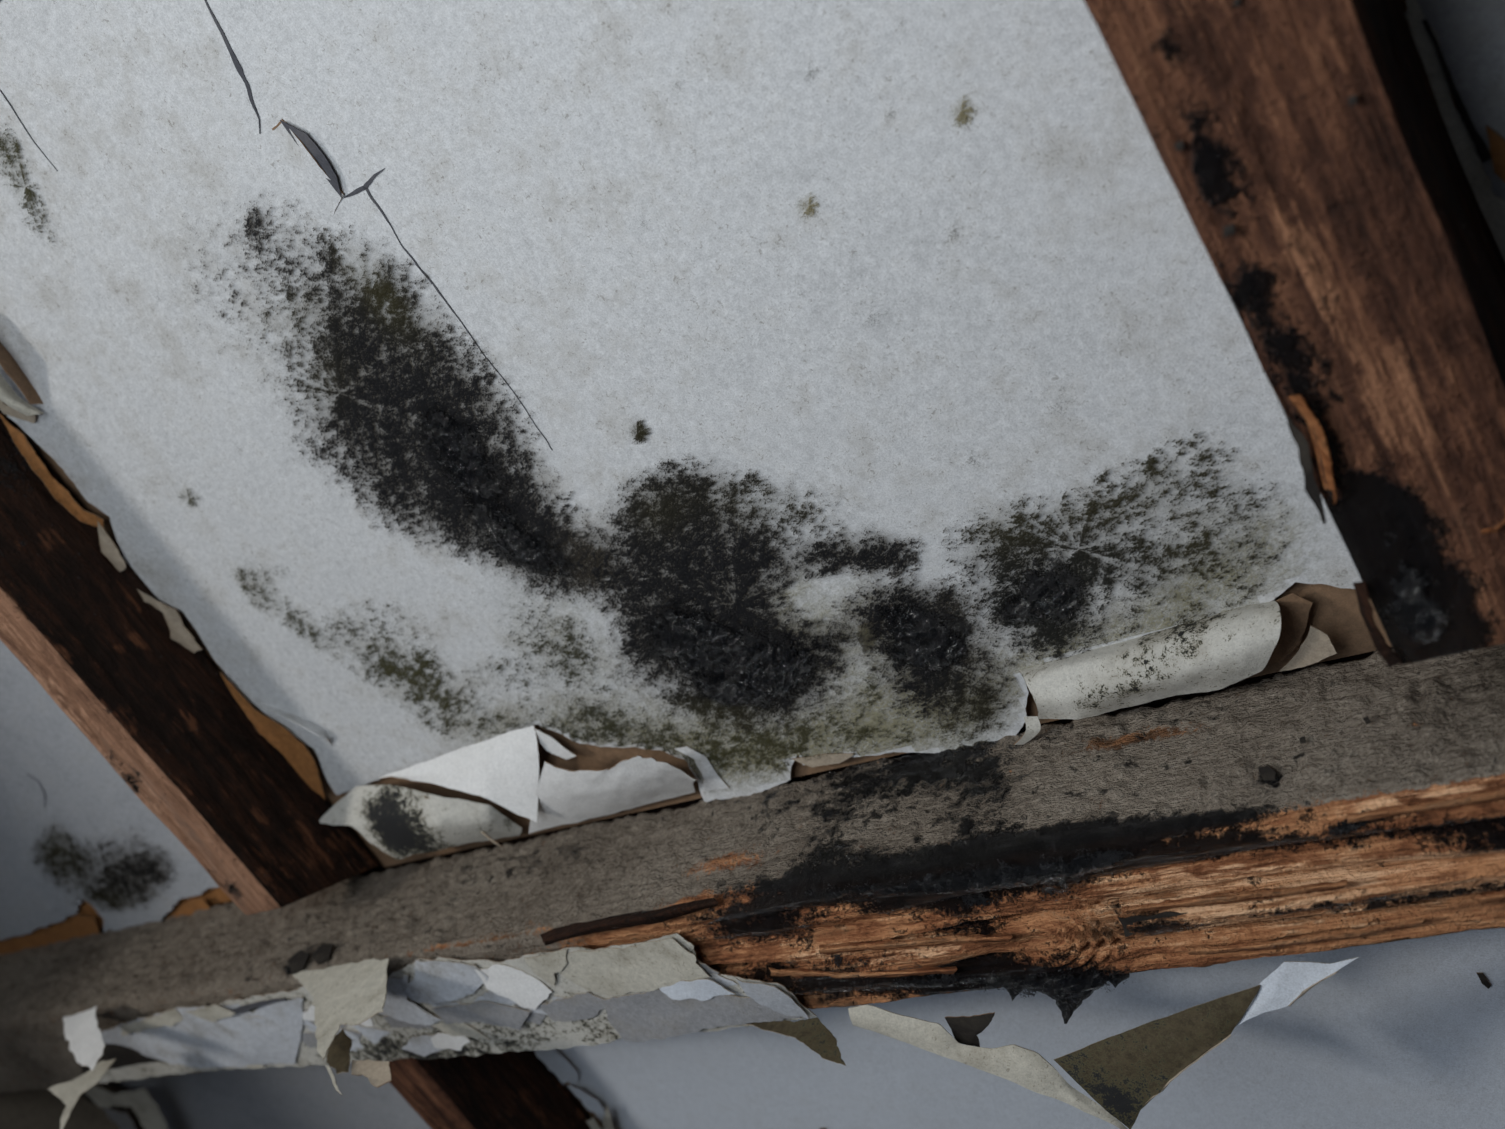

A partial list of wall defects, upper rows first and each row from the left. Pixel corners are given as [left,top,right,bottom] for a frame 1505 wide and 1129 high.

crack [0,90,57,171]
crack [204,0,552,450]
damp [182,194,1294,782]
mould [31,825,175,914]
spalling [1118,911,1187,937]
peeling [74,943,333,1083]
peeling [336,933,817,1063]